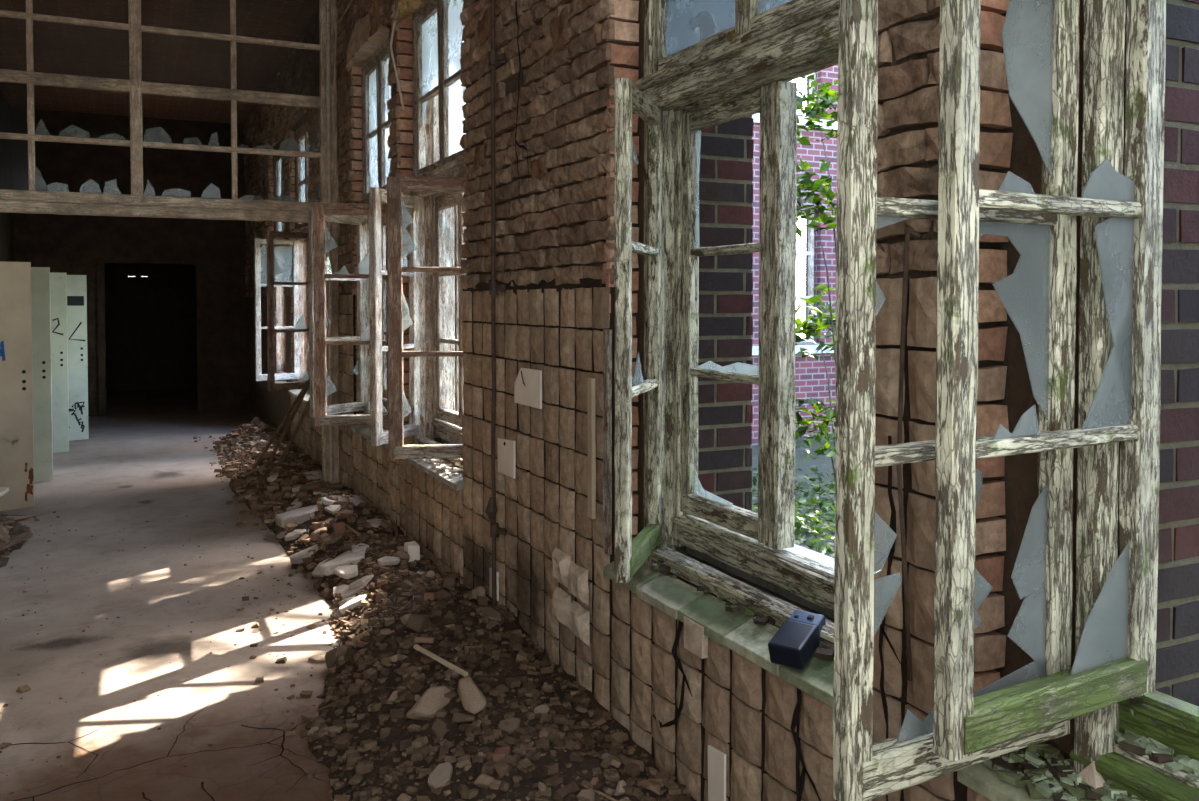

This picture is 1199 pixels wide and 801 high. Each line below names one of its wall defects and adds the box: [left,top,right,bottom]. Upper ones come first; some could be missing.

flaking render [462,278,605,294]
crack [653,620,692,728]
crack [0,699,328,801]
crack [791,688,821,801]